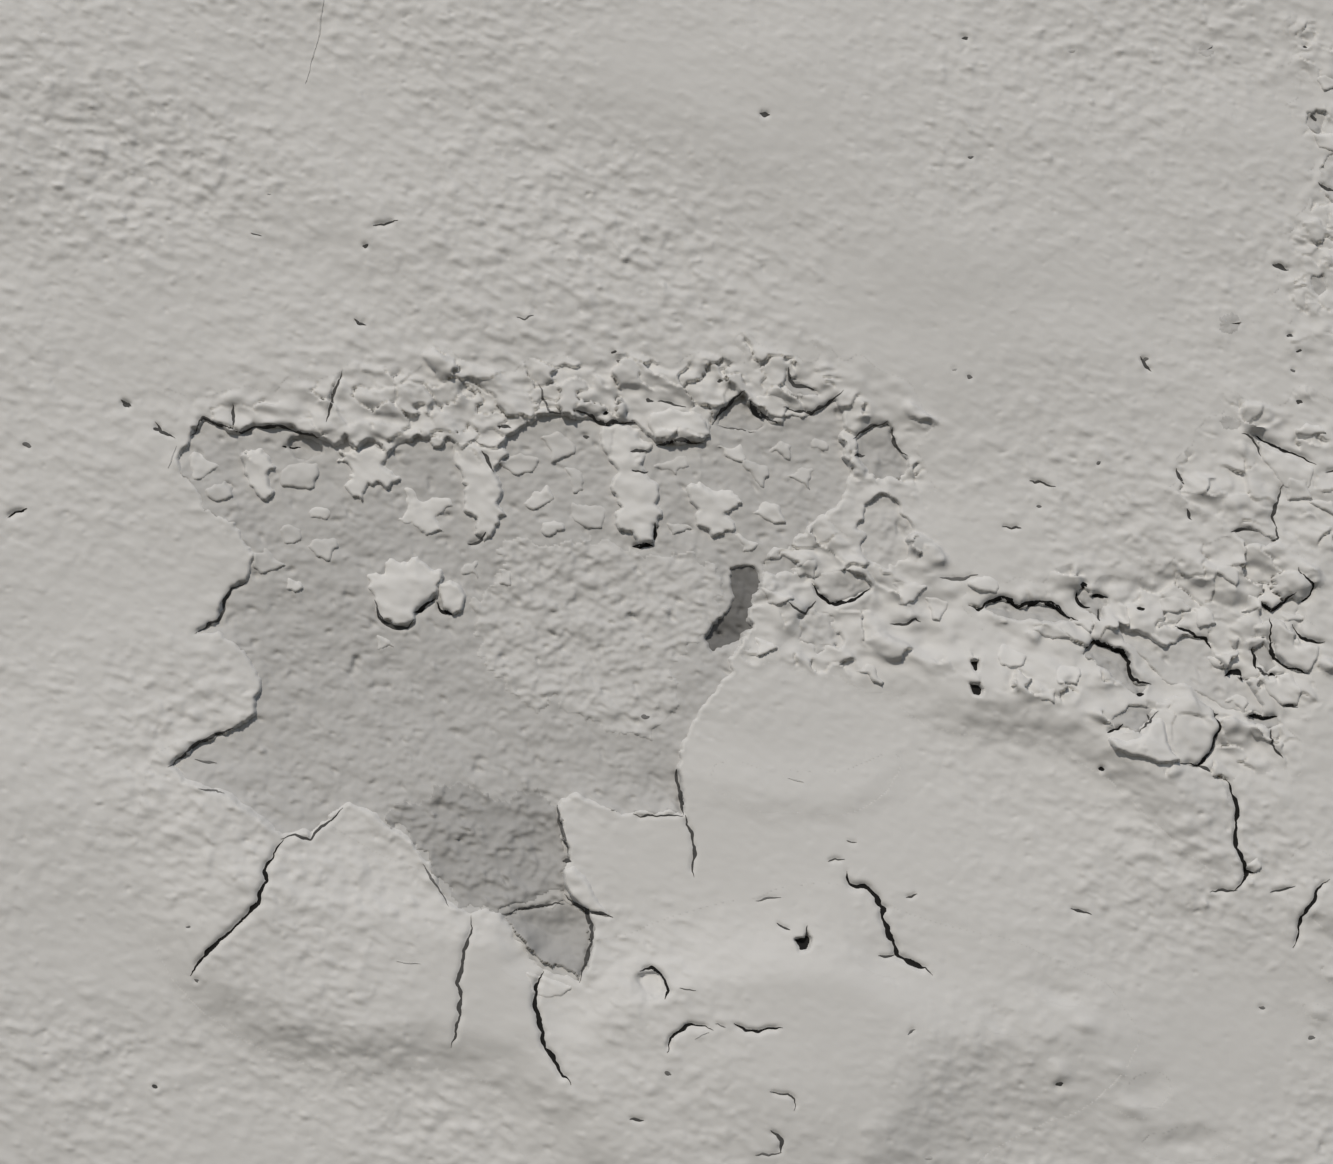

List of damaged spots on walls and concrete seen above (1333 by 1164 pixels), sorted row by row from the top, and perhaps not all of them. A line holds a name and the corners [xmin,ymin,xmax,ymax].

spalling [164,15,1333,998]
crack [1231,433,1333,541]
crack [1176,567,1323,680]
crack [557,805,571,863]
crack [1180,703,1330,947]
crack [190,809,341,976]
crack [423,864,473,1045]
crack [532,971,571,1084]
crack [505,895,612,983]
crack [641,965,696,998]
crack [667,1023,782,1053]
crack [828,840,931,973]